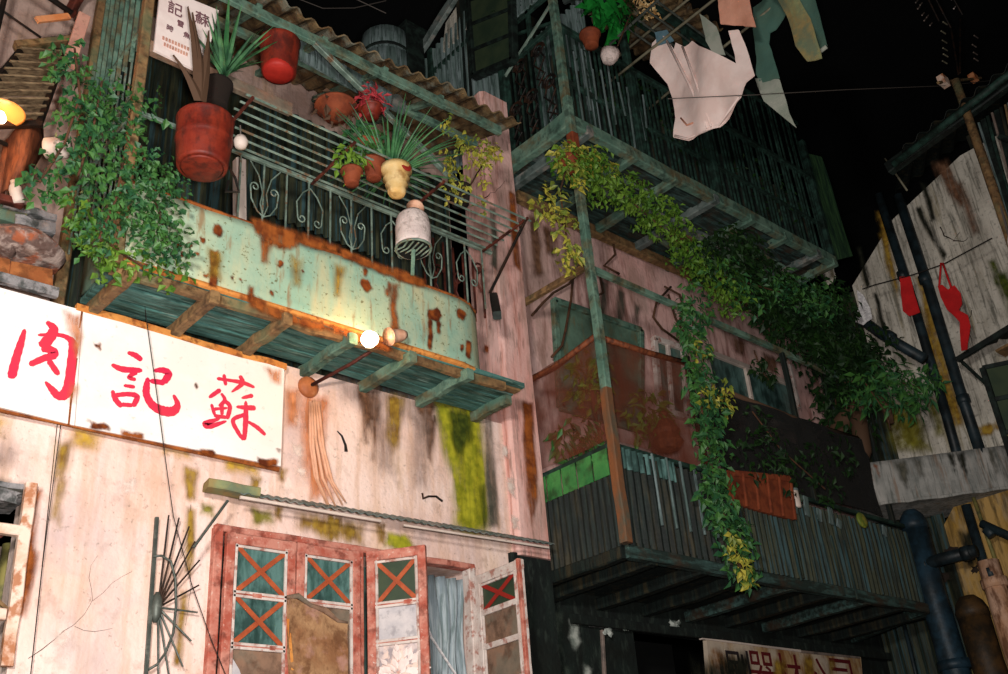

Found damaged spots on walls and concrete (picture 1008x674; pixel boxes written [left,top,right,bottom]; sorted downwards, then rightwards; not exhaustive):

rust [124,189,477,342]
rust [68,314,81,350]
rust [374,308,476,370]
water stain [358,388,402,448]
water stain [414,402,498,534]